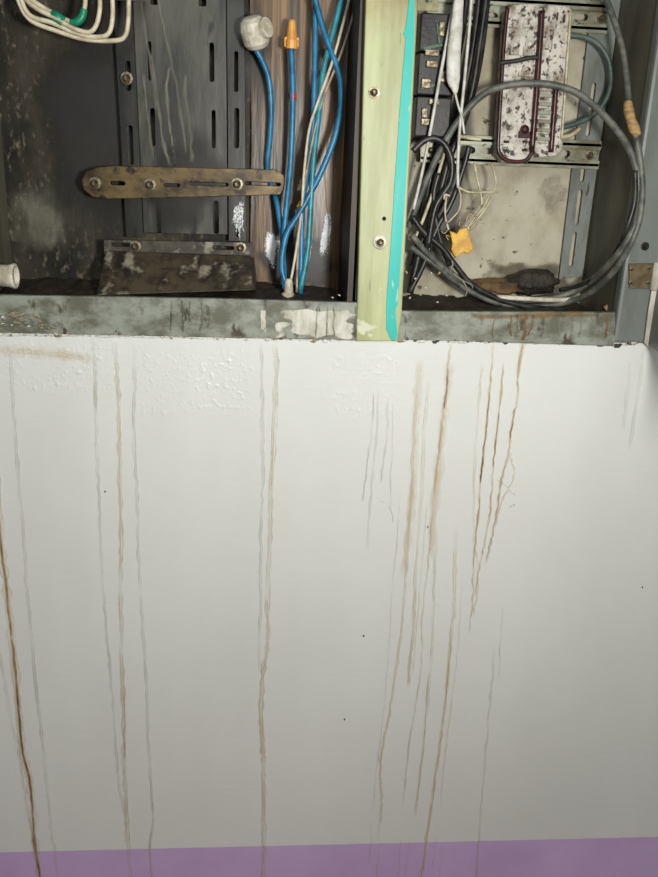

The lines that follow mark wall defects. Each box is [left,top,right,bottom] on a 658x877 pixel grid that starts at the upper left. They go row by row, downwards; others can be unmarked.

corrosion [476,313,587,383]
corrosion [428,466,439,557]
corrosion [473,407,514,564]
corrosion [0,538,40,873]